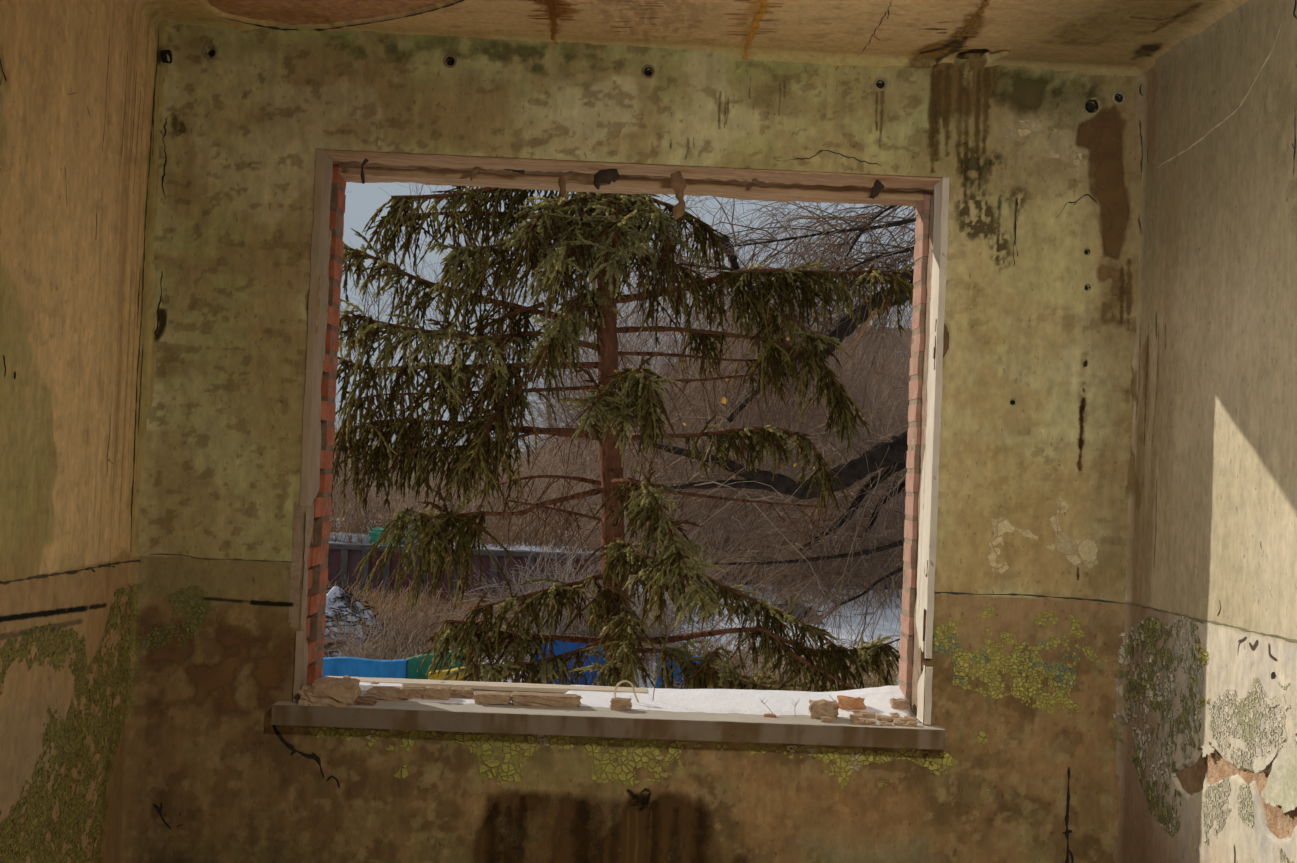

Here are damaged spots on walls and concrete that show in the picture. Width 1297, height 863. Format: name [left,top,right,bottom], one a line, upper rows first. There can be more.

flaking render [207,0,464,31]
water stain [909,0,1065,265]
water stain [1077,87,1131,324]
peeling [0,582,144,863]
crack [272,725,340,788]
water stain [627,788,657,863]
peeling [922,606,1297,863]